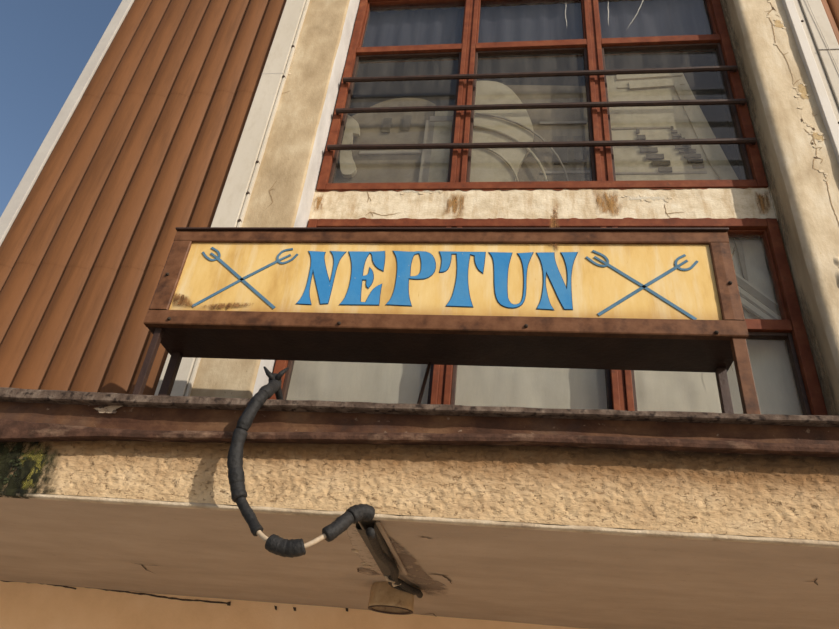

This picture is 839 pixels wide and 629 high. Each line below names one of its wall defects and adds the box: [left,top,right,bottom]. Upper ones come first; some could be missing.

crack [764,0,839,224]
rust [446,196,464,216]
rust [597,194,618,214]